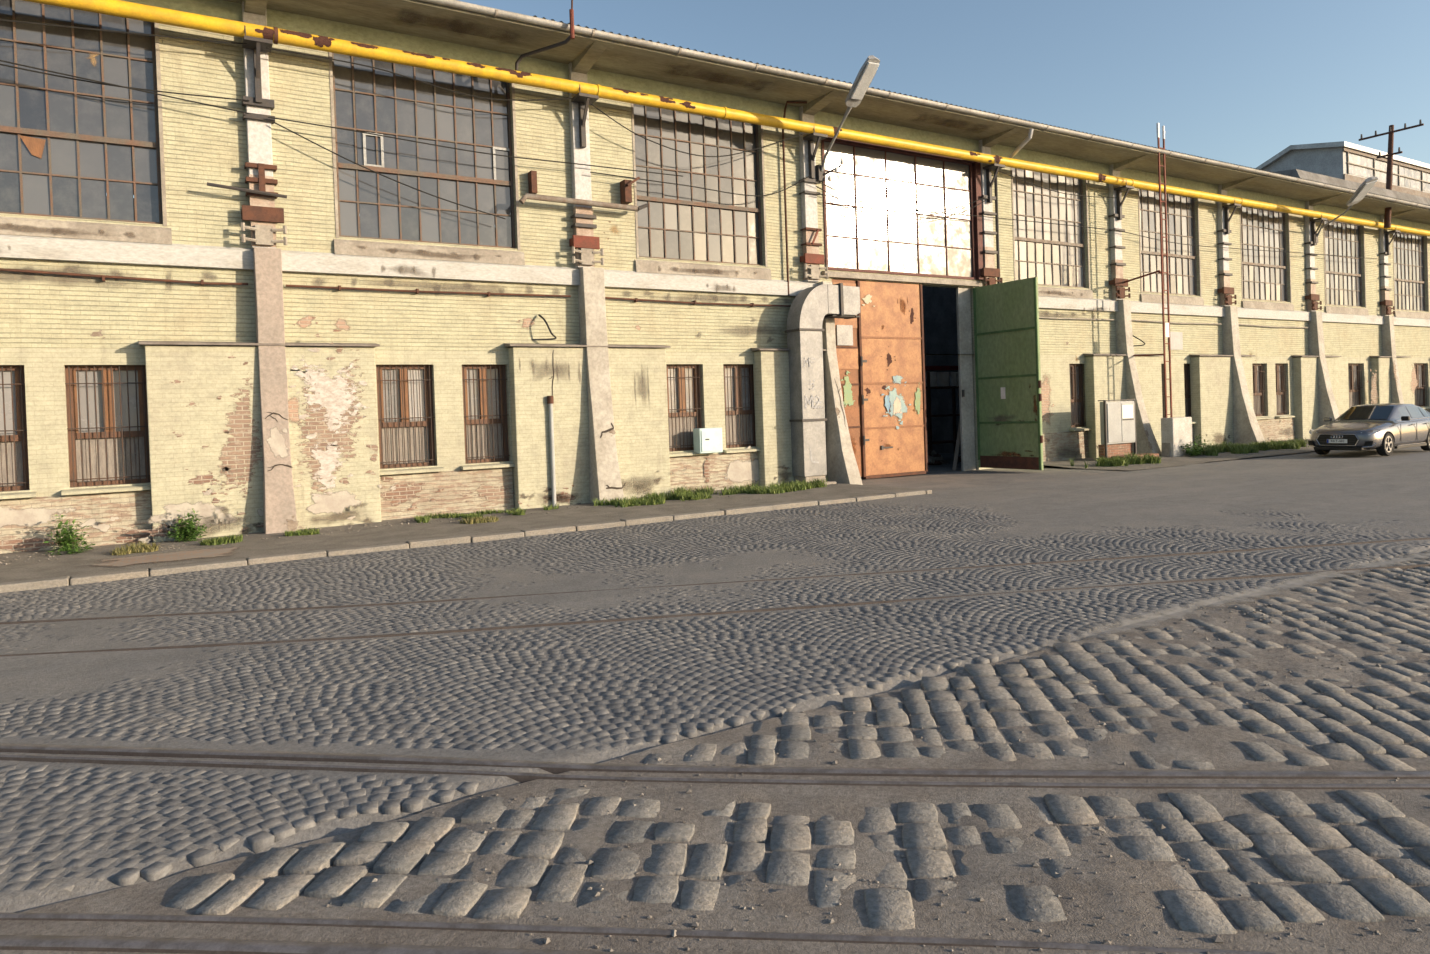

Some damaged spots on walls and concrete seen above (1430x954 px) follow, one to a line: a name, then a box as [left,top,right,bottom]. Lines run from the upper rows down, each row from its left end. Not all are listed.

rust [897,298,916,324]
peeling [882,375,923,429]
peeling [185,315,444,532]
flaking render [461,484,575,507]
flaking render [0,517,183,552]